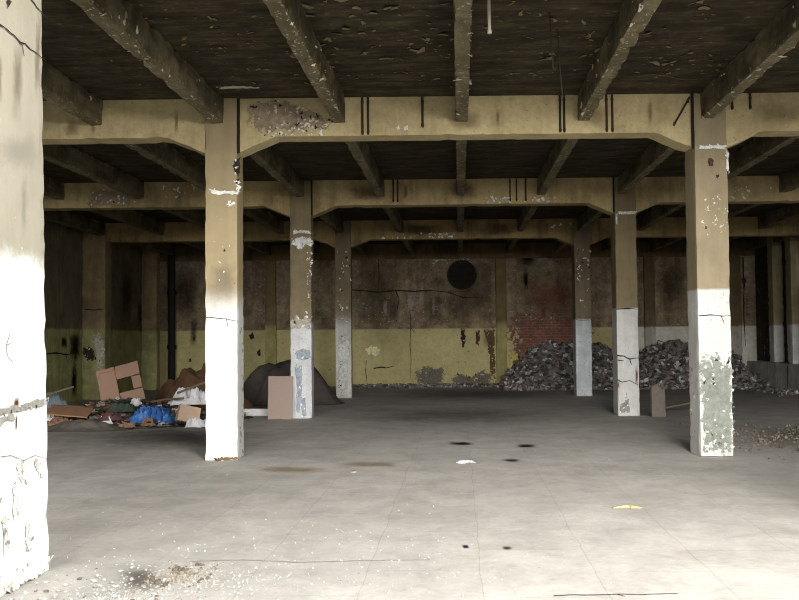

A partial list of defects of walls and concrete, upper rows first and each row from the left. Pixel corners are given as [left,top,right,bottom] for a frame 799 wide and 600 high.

peeling [247,0,401,137]
peeling [208,158,241,207]
peeling [291,228,313,301]
flaking render [507,308,573,369]
spalling [0,397,49,427]
peeling [1,459,44,556]
spalling [0,555,54,596]